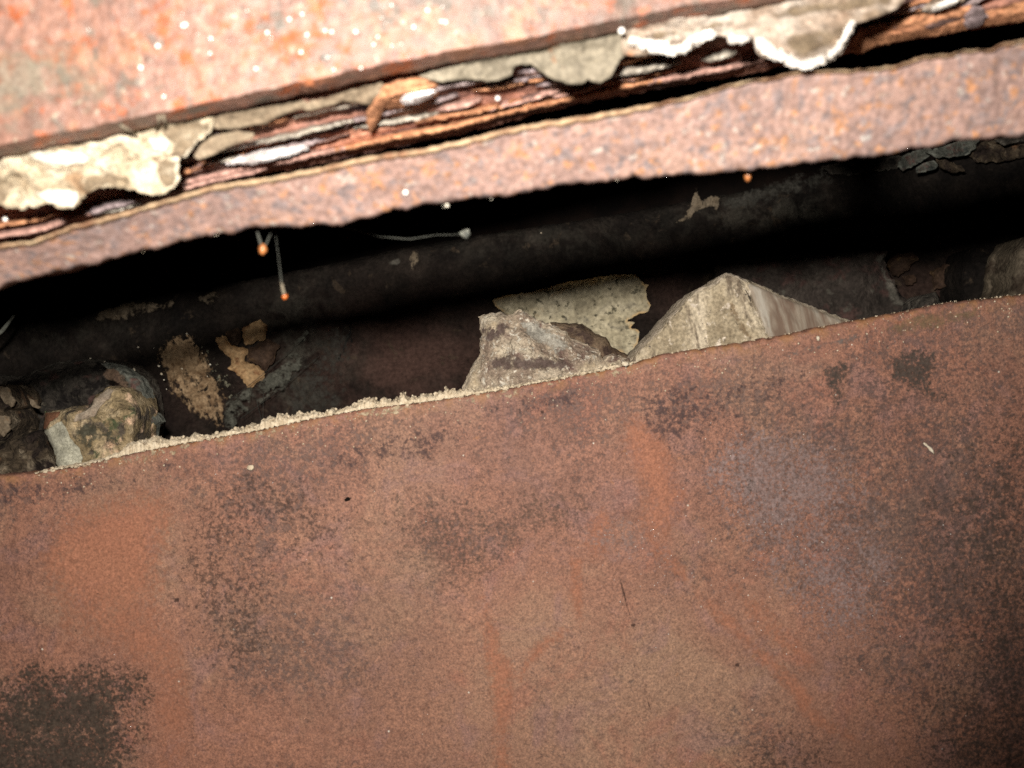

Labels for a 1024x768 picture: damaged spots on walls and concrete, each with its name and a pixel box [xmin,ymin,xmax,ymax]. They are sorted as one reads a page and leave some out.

peeling [419,0,904,85]
rust [836,0,1024,57]
peeling [0,83,389,210]
rust [0,32,787,241]
peeling [679,192,720,221]
rust [103,369,128,387]
water stain [0,662,150,768]